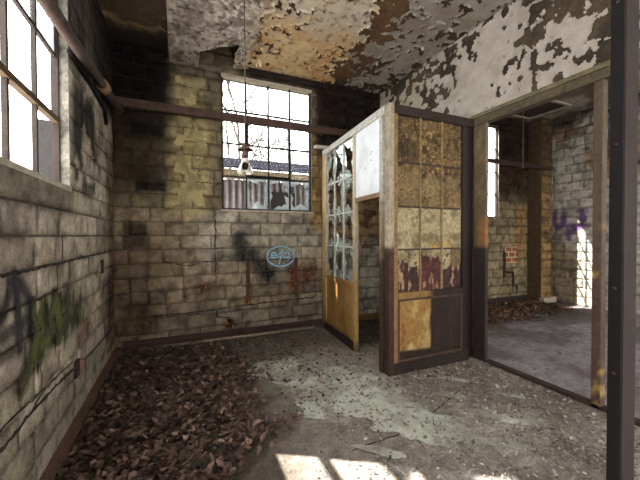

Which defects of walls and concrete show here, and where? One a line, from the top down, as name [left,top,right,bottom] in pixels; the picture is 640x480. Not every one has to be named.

peeling [247,0,611,118]